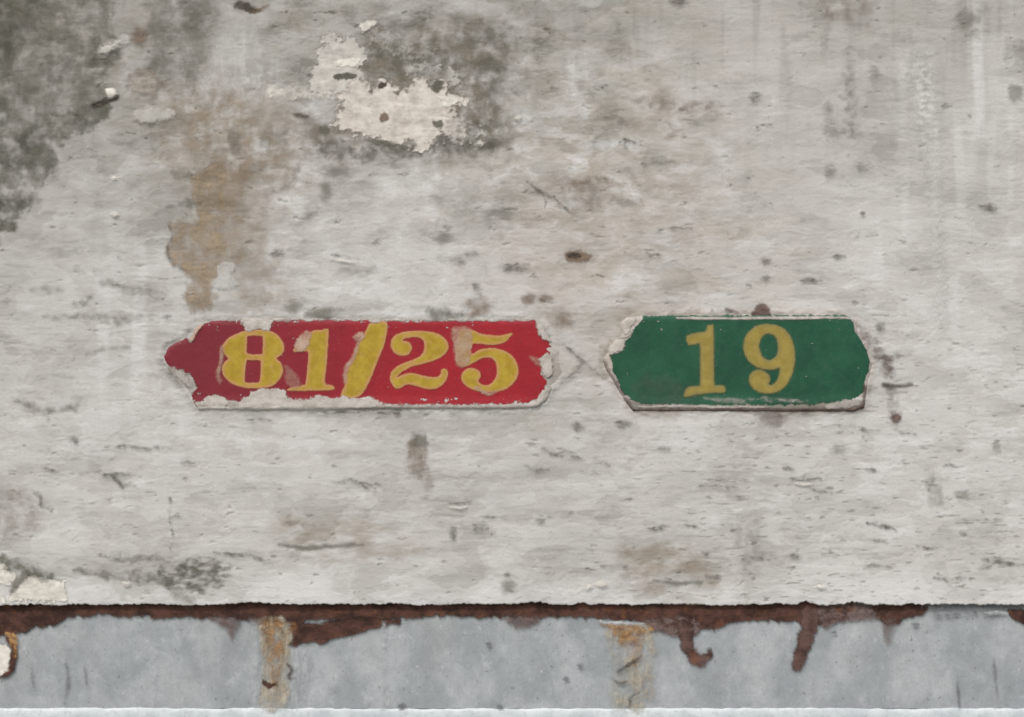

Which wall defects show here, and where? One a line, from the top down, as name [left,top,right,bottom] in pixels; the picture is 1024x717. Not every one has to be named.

damp [0,0,57,182]
damp [46,56,110,134]
peeling [266,20,484,153]
damp [359,30,499,149]
damp [0,220,16,231]
peeling [0,554,68,604]
rust [0,601,928,712]
rust [1008,609,1024,624]